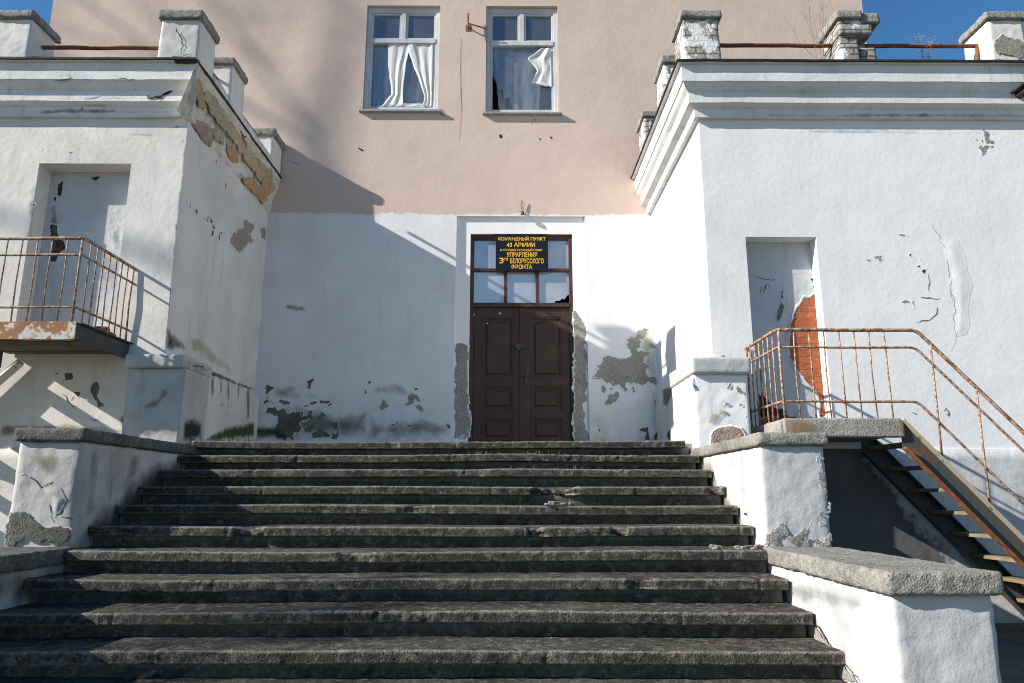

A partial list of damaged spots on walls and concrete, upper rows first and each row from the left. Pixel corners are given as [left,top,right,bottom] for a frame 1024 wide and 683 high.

flaking render [170,59,276,205]
peeling [971,128,995,156]
flaking render [186,201,267,256]
crack [917,232,956,347]
flaking render [262,378,340,442]
peeling [377,387,425,414]
flaking render [445,342,472,440]
flaking render [571,310,658,441]
flaking render [775,268,826,418]
flaking render [3,512,73,547]
flaking render [709,457,832,550]